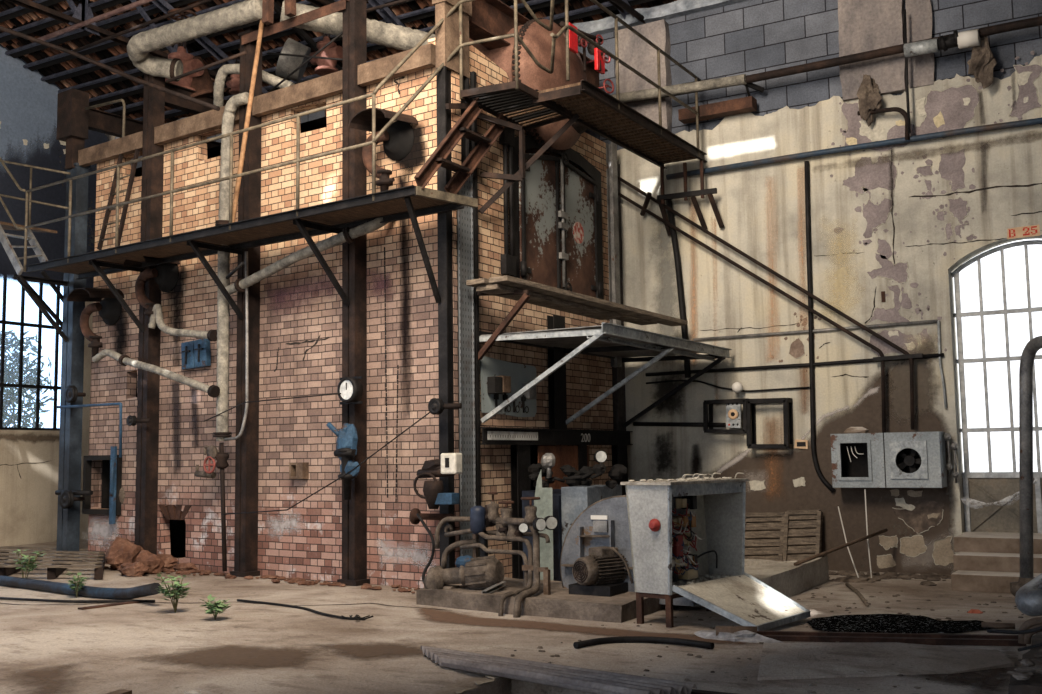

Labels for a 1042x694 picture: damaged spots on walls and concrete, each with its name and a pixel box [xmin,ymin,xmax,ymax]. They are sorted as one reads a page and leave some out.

flaking render [994,50,1042,124]
flaking render [830,79,982,357]
damp [656,434,673,471]
flaking render [877,489,954,569]